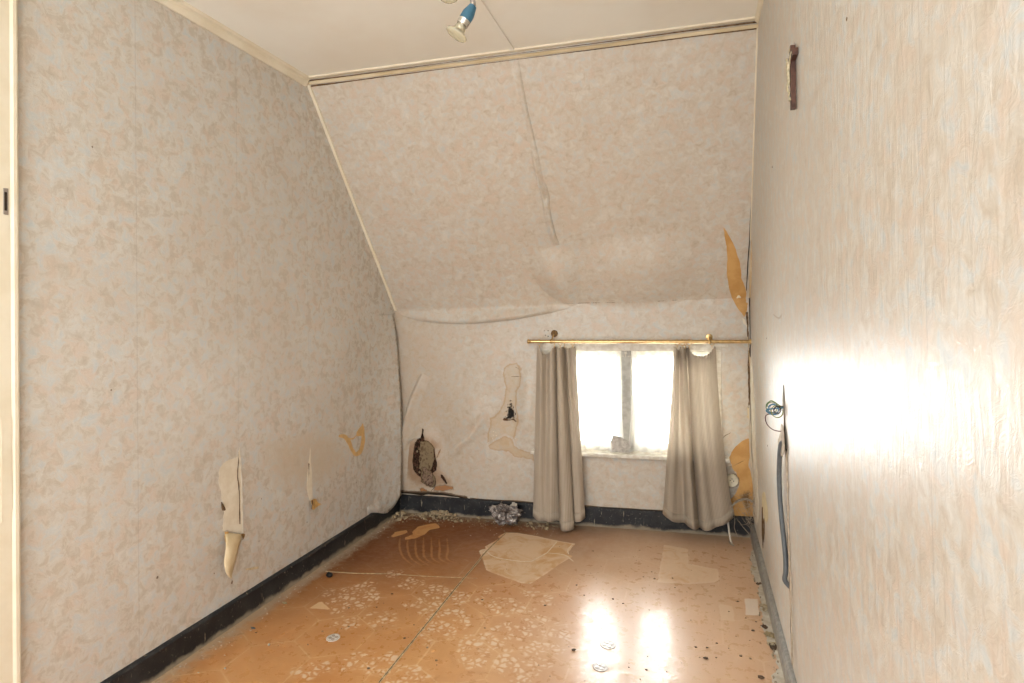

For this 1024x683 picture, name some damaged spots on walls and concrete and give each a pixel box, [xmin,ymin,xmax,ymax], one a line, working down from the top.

peeling [724,229,749,327]
spalling [405,427,460,493]
peeling [726,438,768,546]